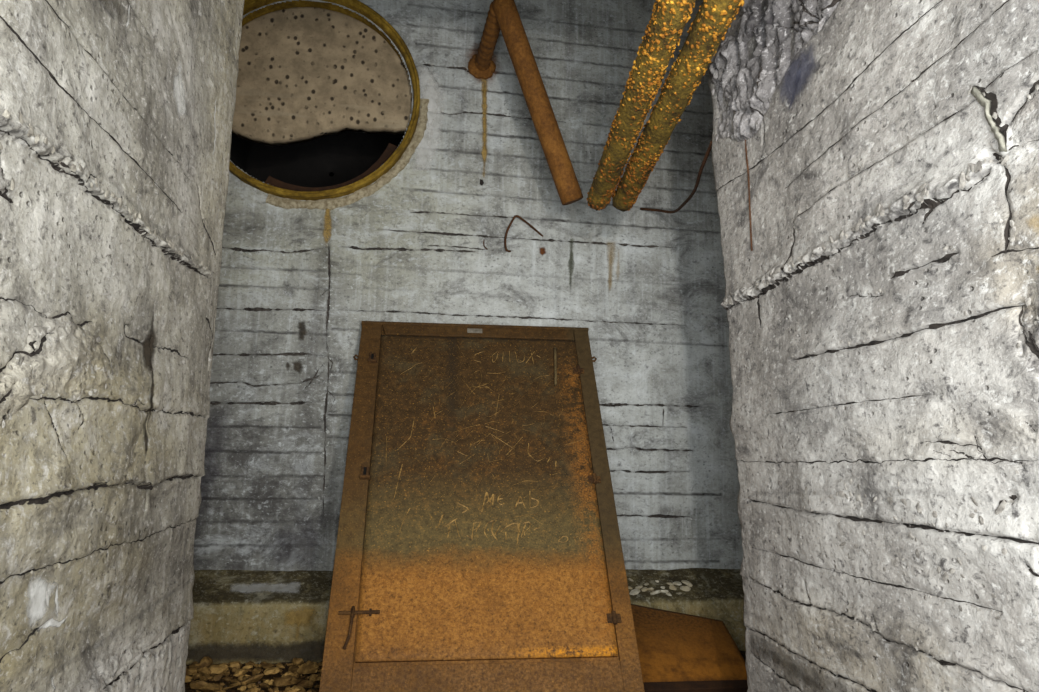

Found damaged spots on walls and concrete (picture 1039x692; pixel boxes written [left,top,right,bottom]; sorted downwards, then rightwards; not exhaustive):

corrosion [477,54,496,161]
spalling [709,0,841,145]
crack [717,0,1039,326]
crack [0,0,678,513]
crack [791,305,1024,360]
crack [599,403,700,474]
crack [766,393,944,417]
crack [741,436,1036,474]
crack [0,518,196,585]
crack [751,500,1039,577]
crack [104,624,188,690]
crack [749,547,1028,692]